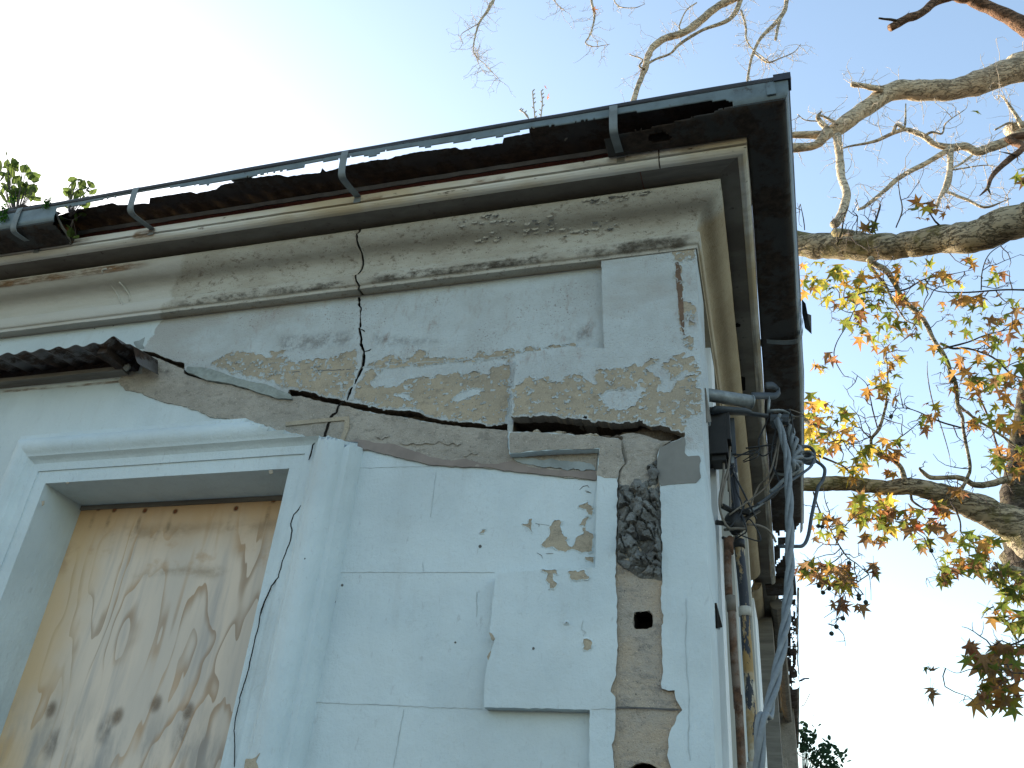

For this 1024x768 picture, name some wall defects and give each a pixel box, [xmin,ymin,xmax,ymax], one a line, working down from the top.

crack [143,285,509,460]
flaking render [118,249,704,481]
crack [233,505,301,767]
peeling [521,500,595,591]
flaking render [611,539,682,768]